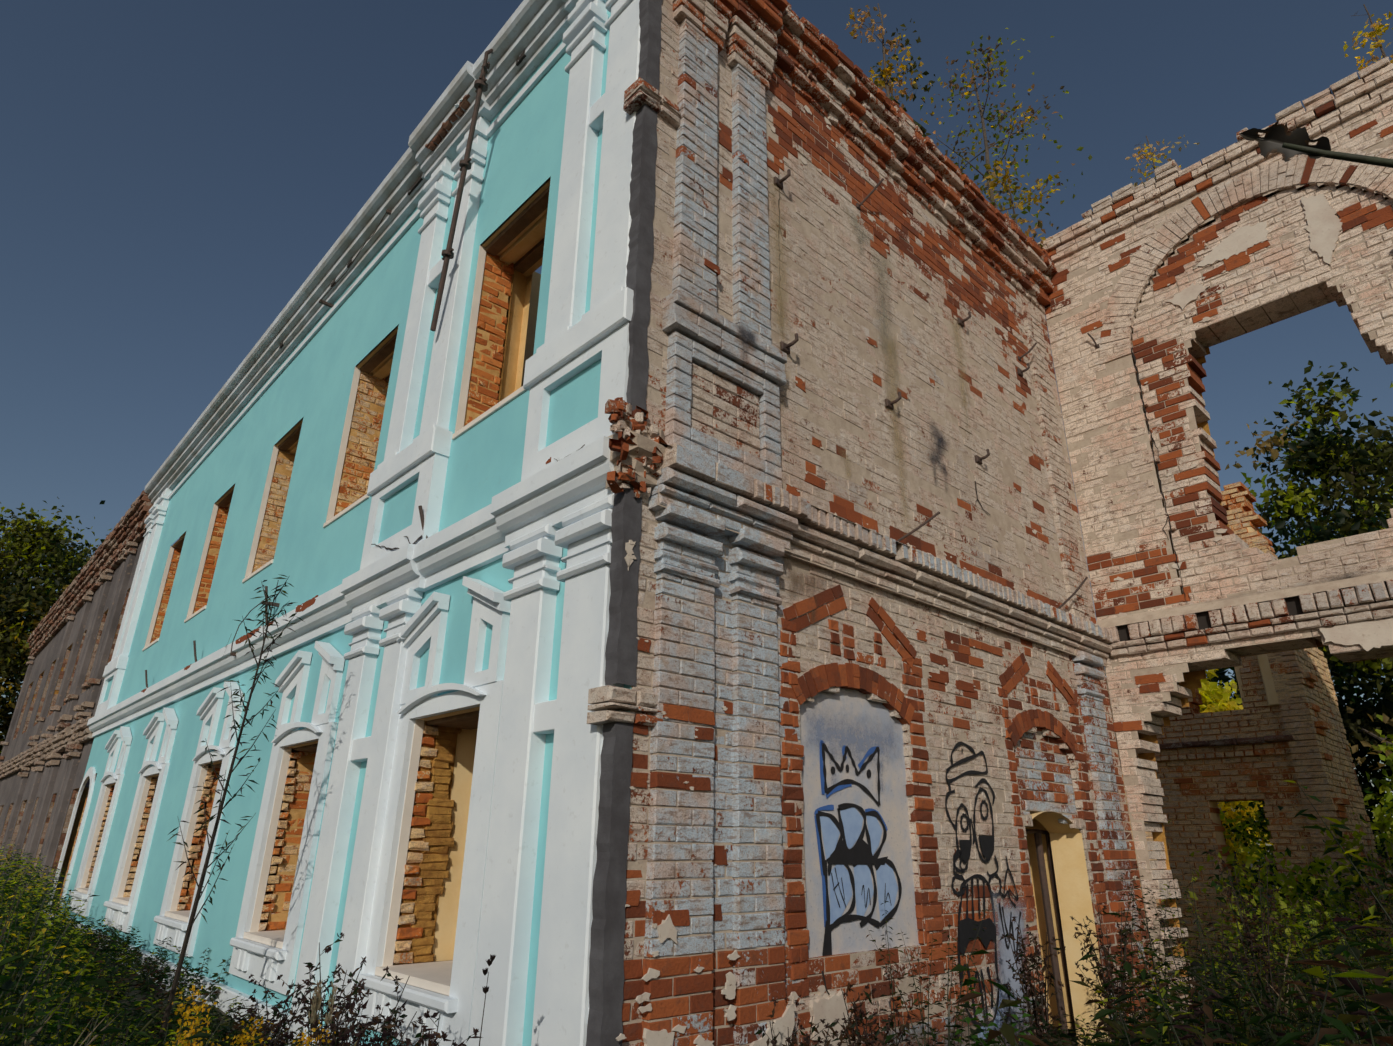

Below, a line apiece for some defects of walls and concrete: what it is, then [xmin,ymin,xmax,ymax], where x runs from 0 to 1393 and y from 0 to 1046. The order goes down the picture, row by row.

spalling [1337,202,1393,232]
flaking render [766,70,1031,410]
spalling [1152,196,1270,324]
spalling [605,397,668,498]
leakage [932,427,946,464]
spalling [1134,673,1166,693]
spalling [661,701,733,740]
spalling [712,849,728,866]
spalling [625,890,690,928]
spalling [712,904,723,921]
flaking render [615,951,660,1041]
flaking render [671,950,741,1046]